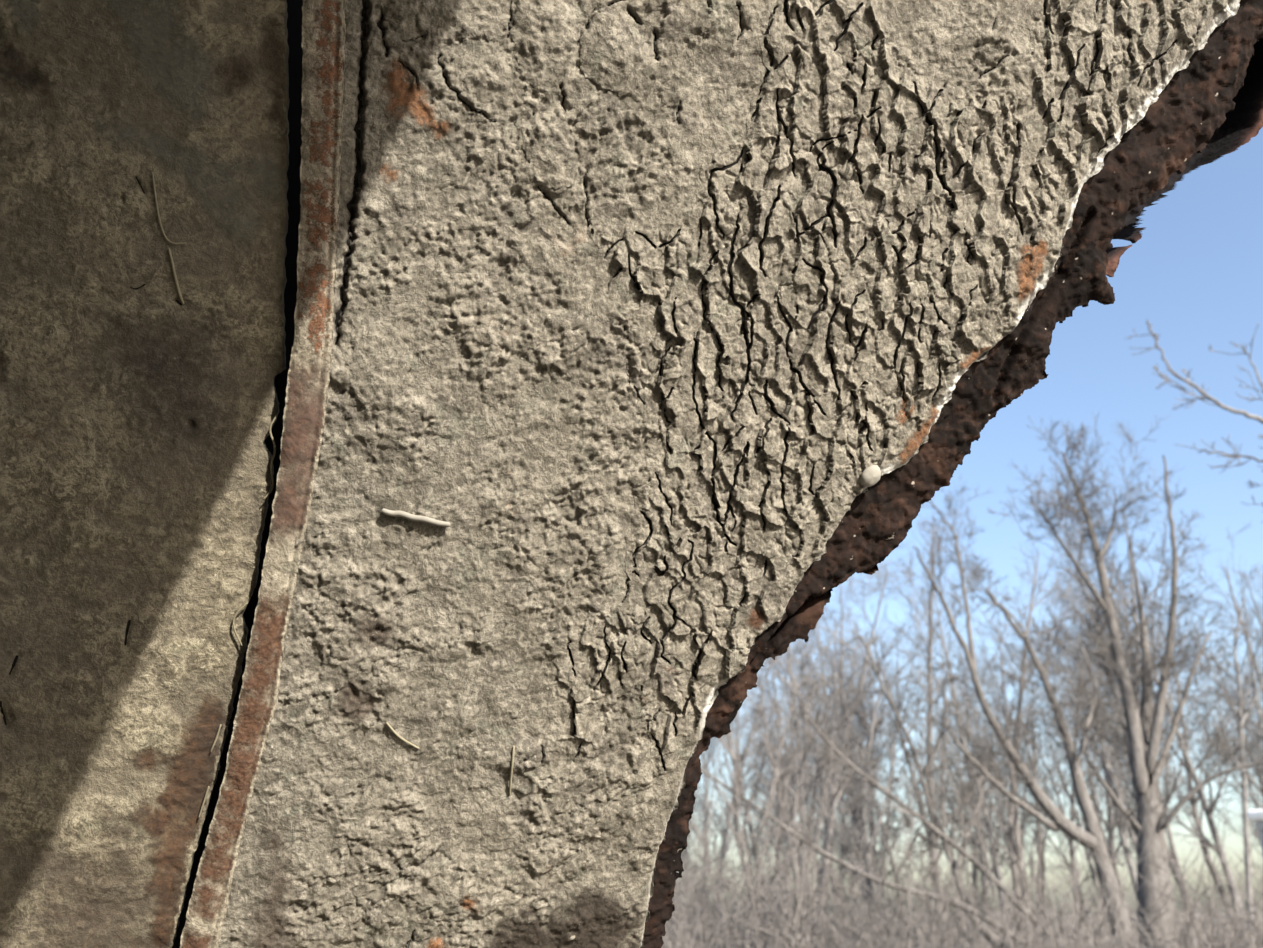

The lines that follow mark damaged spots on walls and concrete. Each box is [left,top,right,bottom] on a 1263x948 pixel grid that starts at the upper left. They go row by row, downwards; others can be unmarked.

corrosion [298,0,343,357]
corrosion [382,61,449,137]
crack [335,0,496,345]
crack [538,169,680,290]
crack [578,0,658,60]
crack [635,0,974,545]
peeling [542,0,1240,779]
crack [915,18,1009,208]
crack [1042,0,1099,119]
crack [567,472,715,770]
corrosion [137,595,290,948]
leakage [485,888,640,948]